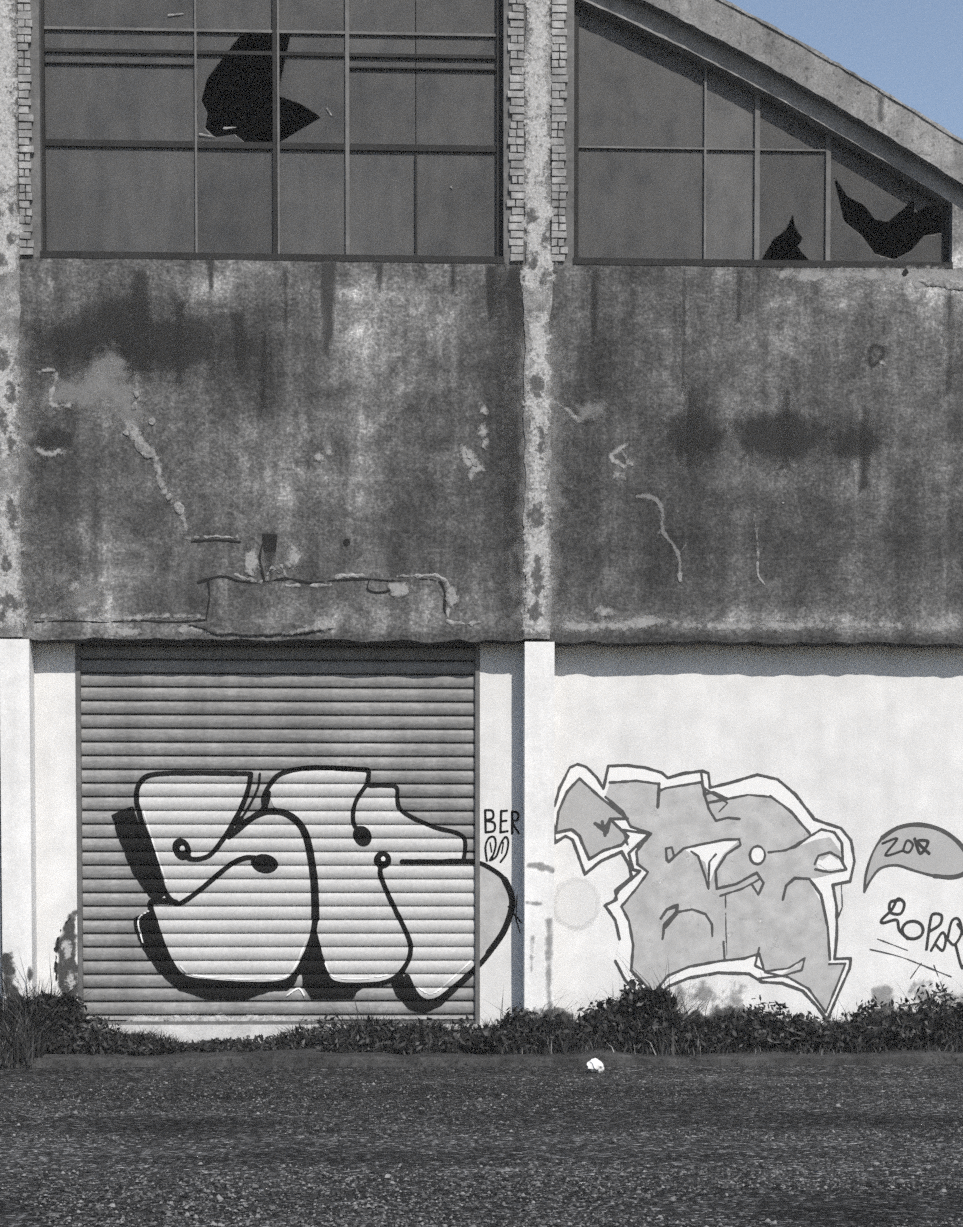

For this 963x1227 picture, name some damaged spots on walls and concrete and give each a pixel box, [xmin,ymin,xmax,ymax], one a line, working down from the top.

damp [744,412,818,457]
damp [842,425,877,489]
crack [637,494,686,582]